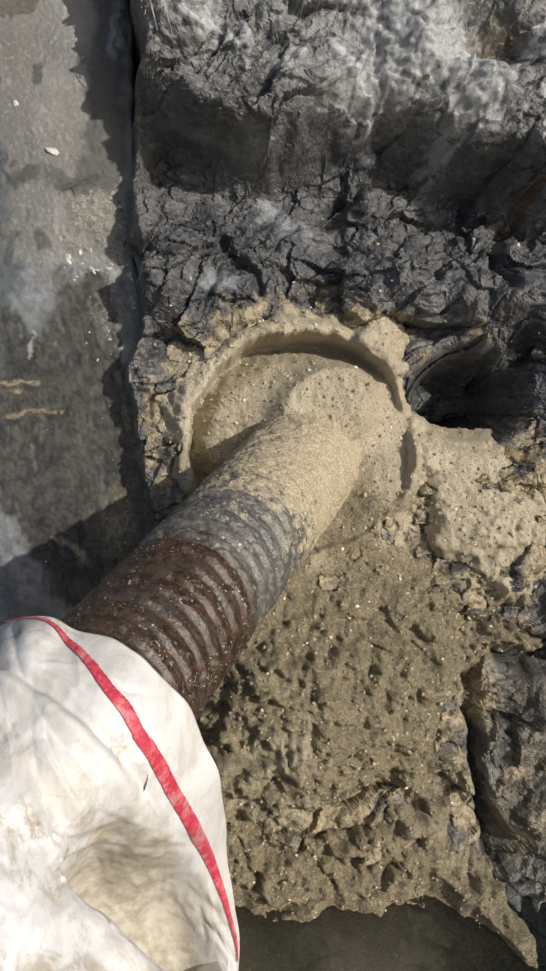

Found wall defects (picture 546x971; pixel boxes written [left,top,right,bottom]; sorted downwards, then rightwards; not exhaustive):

damp [0,0,37,17]
damp [0,143,39,223]
damp [33,64,42,83]
damp [59,0,126,193]
damp [0,229,148,608]
crack [461,708,546,903]